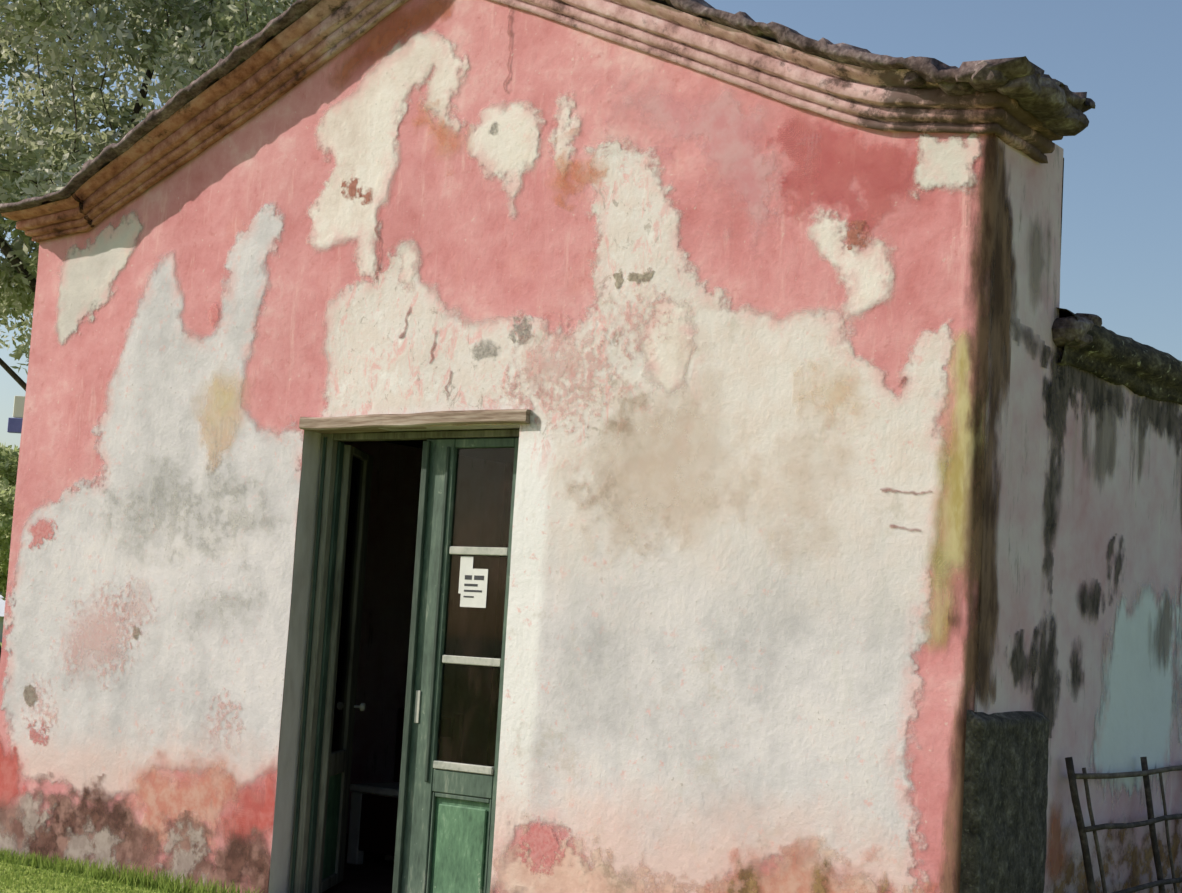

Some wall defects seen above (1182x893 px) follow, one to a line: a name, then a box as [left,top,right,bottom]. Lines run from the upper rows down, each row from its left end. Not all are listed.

crack [503,7,511,91]
leakage [1032,226,1050,294]
peeling [0,204,304,872]
peeling [307,32,955,893]
leakage [939,135,1016,893]
leakage [1011,622,1084,738]
leakage [1080,533,1123,618]
leakage [1043,353,1182,593]
leakage [1157,597,1172,664]
leakage [0,776,270,893]
leakage [728,869,759,893]